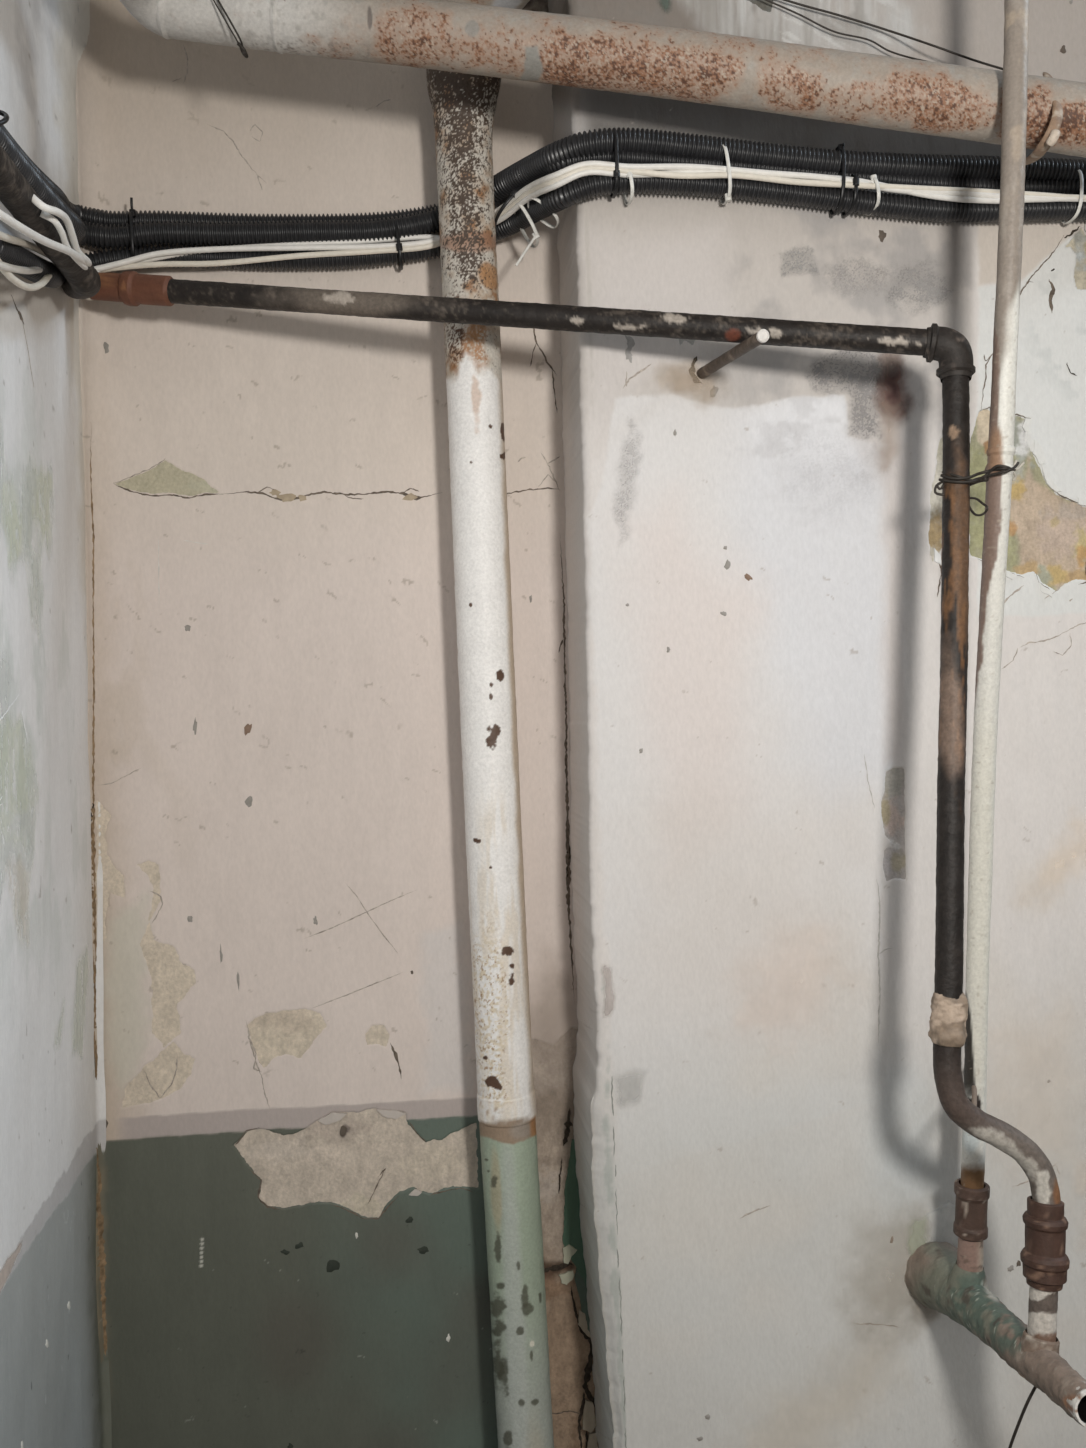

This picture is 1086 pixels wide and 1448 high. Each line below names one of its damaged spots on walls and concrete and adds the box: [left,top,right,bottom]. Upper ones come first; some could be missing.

crack [1020,222,1086,311]
leakage [814,351,881,435]
crack [981,353,993,409]
crack [229,487,438,502]
peeling [928,437,943,596]
spalling [969,407,990,561]
spalling [1006,414,1086,597]
peeling [94,800,125,941]
peeling [122,860,196,1107]
peeling [246,1009,327,1106]
spalling [234,1108,479,1239]
spalling [532,1028,598,1448]